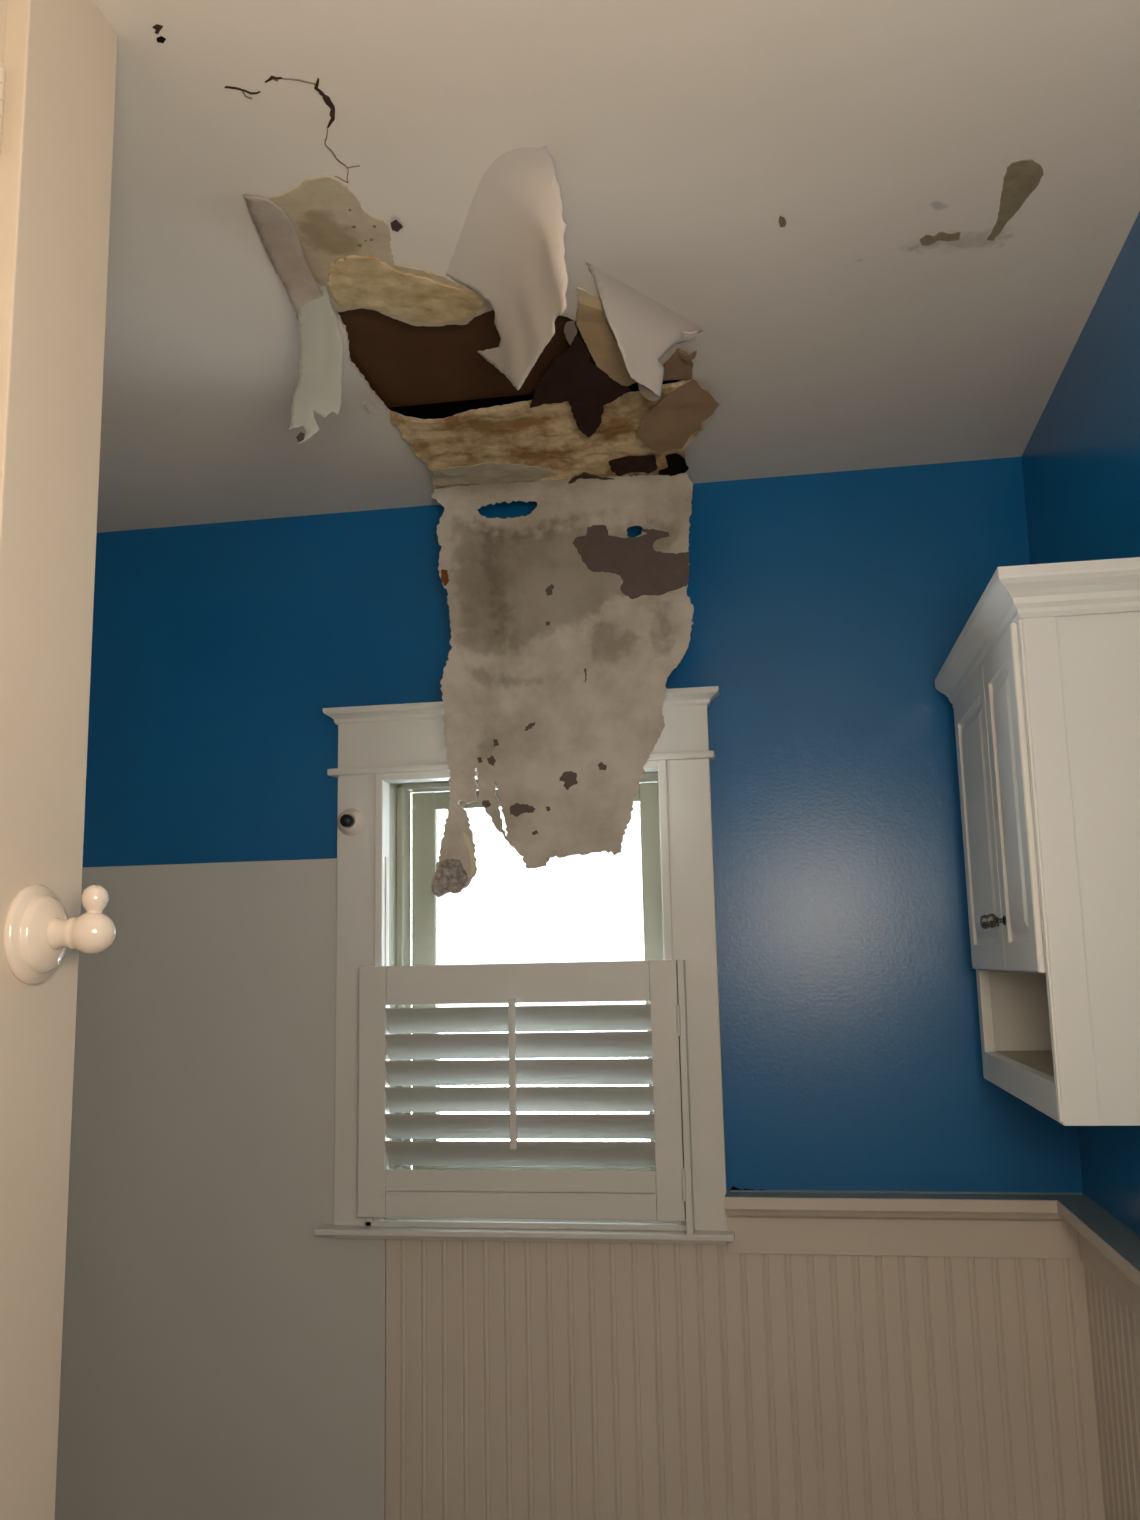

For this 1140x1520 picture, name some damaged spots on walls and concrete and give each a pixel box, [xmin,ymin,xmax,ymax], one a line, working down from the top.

crack [225,75,360,184]
peeling [271,145,569,419]
peeling [585,262,703,402]
peeling [919,231,961,246]
peeling [987,159,1044,241]
peeling [572,525,690,599]